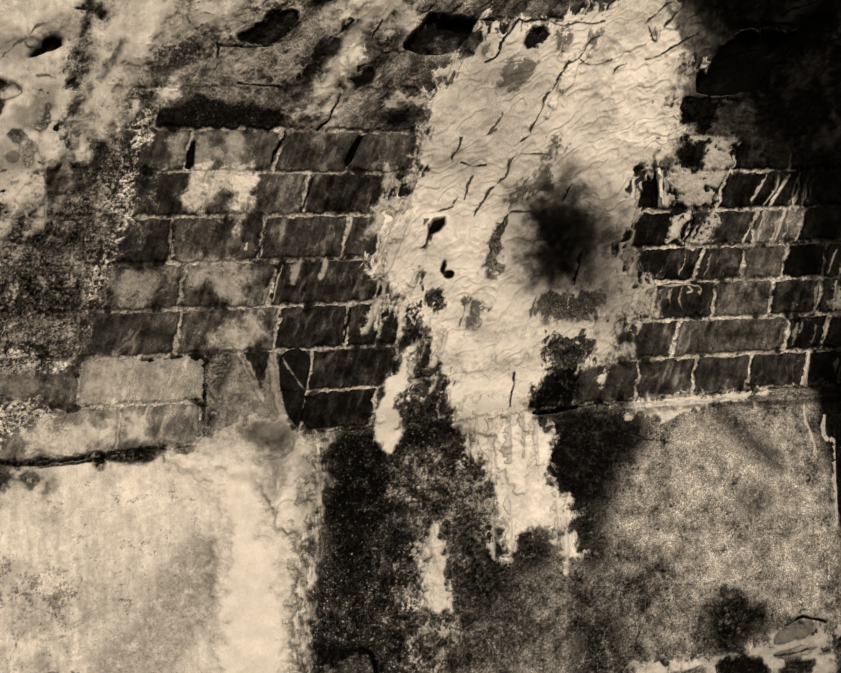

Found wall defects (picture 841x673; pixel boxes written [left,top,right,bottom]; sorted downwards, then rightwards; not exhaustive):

peeling [0,0,115,218]
peeling [107,0,202,130]
flaking render [236,8,299,47]
spalling [403,15,476,56]
crack [440,1,699,216]
crack [499,209,534,228]
crack [573,251,583,285]
spalling [638,172,659,208]
leakage [741,174,811,246]
spalling [183,348,310,466]
spalling [393,270,449,429]
leakage [287,0,787,673]